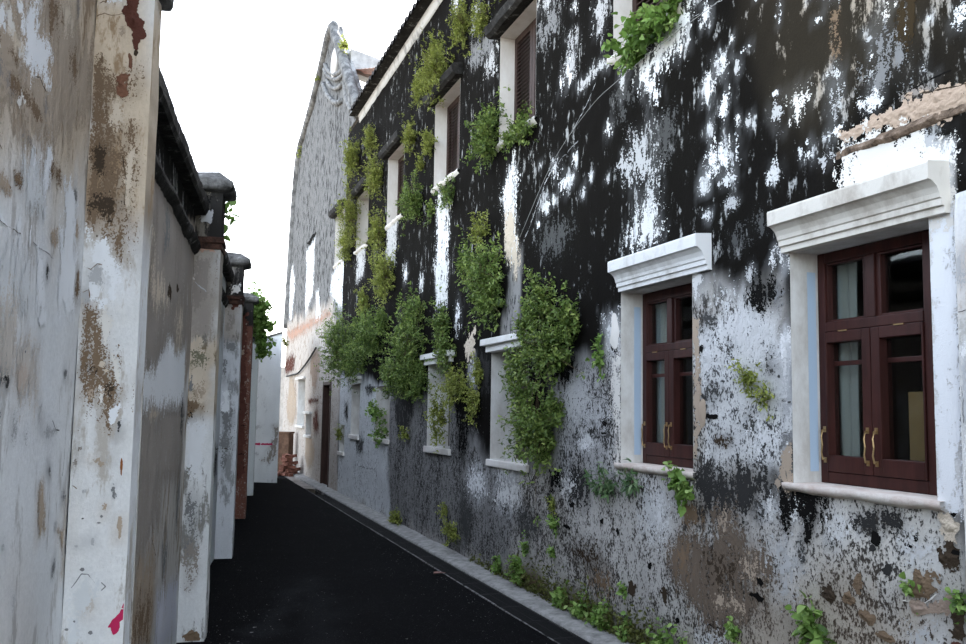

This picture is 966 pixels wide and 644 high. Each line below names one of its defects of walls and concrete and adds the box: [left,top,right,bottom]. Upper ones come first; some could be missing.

mould [536,0,565,55]
peeling [950,1,966,31]
spalling [107,0,147,133]
mould [606,80,642,125]
peeling [771,82,812,127]
leakage [534,204,576,265]
mould [724,203,772,261]
leakage [0,0,237,644]
leakage [214,408,243,479]
leakage [659,412,828,644]
peeling [759,489,818,612]
leakage [848,505,905,538]